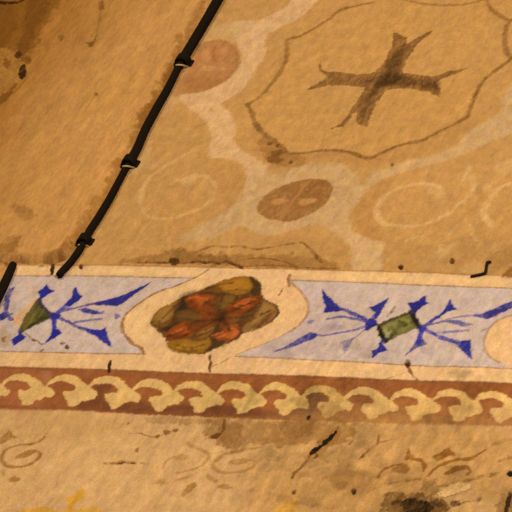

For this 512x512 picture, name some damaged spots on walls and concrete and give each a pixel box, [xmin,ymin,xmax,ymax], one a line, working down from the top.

damp [0,0,59,61]
crack [291,427,339,478]
damp [381,490,464,512]